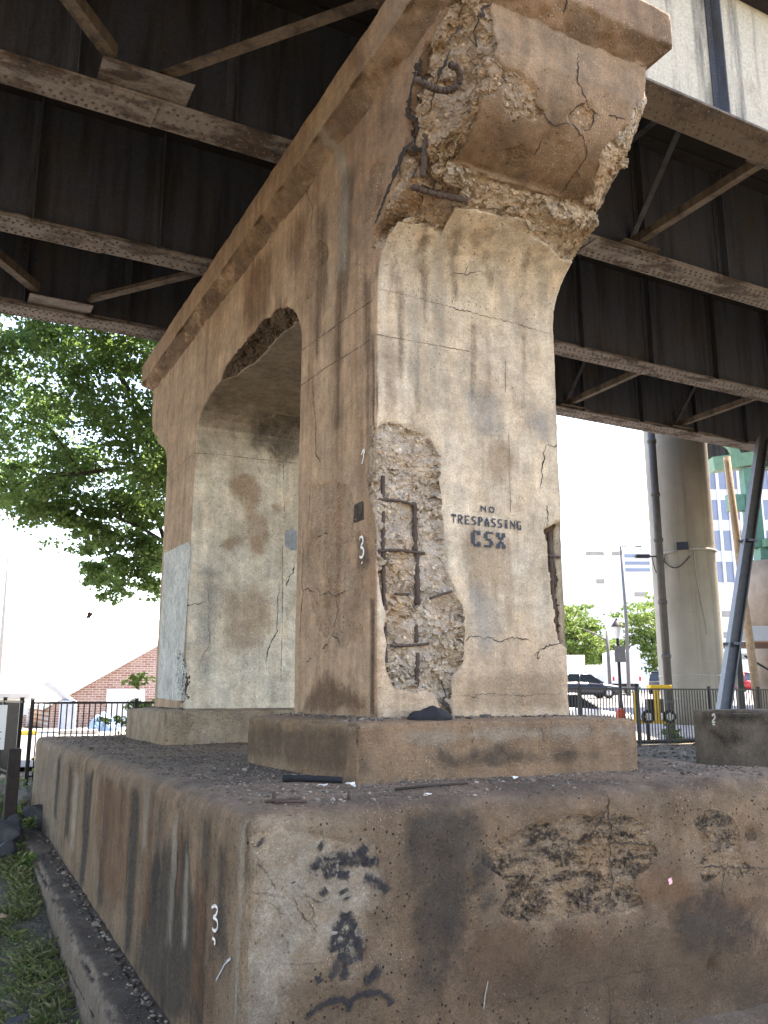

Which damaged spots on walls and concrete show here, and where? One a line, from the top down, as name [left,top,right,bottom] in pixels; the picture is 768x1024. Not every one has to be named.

spalling [371,0,647,260]
crack [533,54,626,194]
spalling [222,307,299,380]
spalling [307,422,465,715]
spalling [544,524,561,643]
crack [466,636,561,659]
leakage [54,760,223,1024]
spalling [482,801,658,922]
spalling [694,808,757,883]